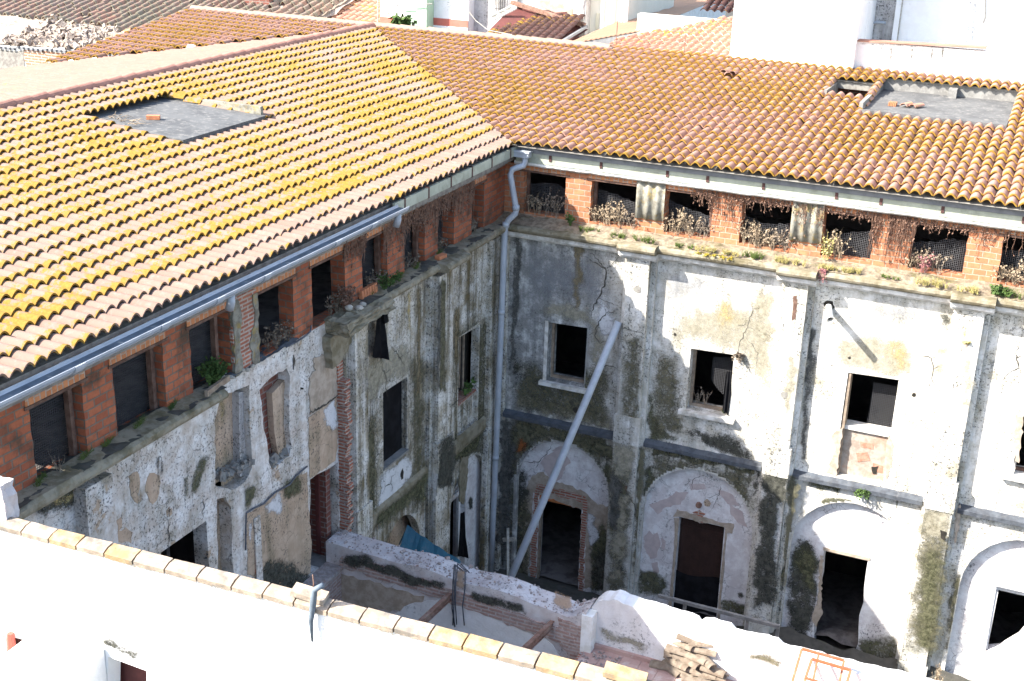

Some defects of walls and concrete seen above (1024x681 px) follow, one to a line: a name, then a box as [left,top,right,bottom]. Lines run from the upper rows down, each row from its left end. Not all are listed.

flaking render [128,471,161,504]
flaking render [300,333,352,444]
leakage [368,345,425,506]
leakage [508,237,614,425]
peeling [517,446,608,589]
crack [589,253,673,379]
leakage [622,338,640,418]
peeling [649,483,747,527]
leakage [650,354,820,635]
crack [738,301,769,364]
flaking render [856,441,883,474]
leakage [908,509,949,651]